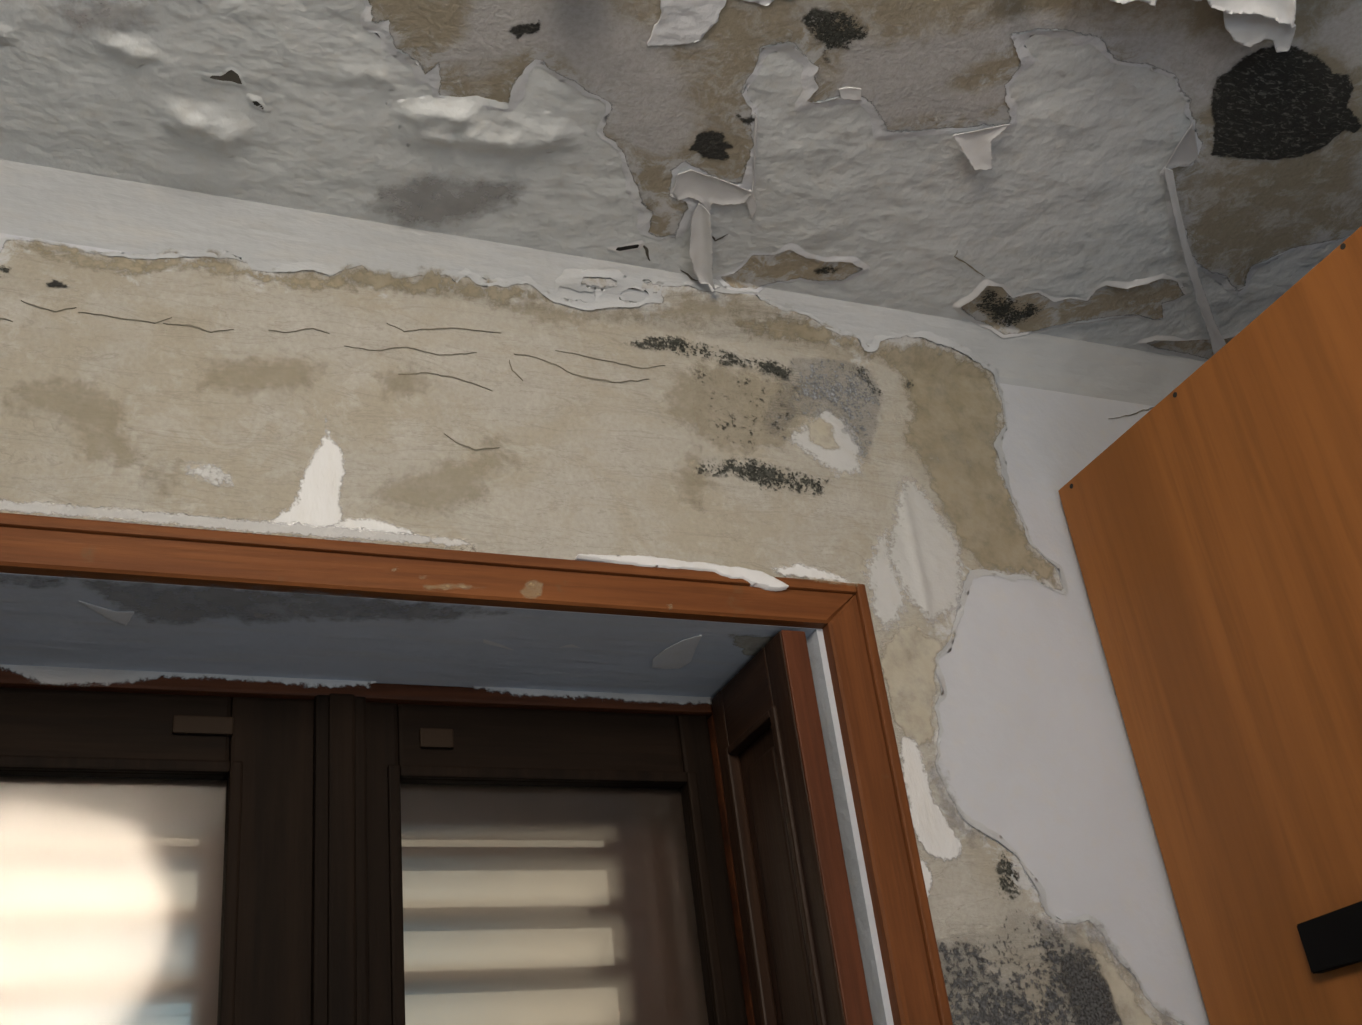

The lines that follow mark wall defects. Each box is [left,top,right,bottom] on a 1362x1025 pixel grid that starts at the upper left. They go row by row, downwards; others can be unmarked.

flaking render [360,0,1362,295]
mould [1211,46,1361,160]
crack [0,300,234,333]
crack [268,323,665,391]
damp [631,317,1055,585]
flaking render [0,238,1190,1025]
damp [938,851,1171,1025]